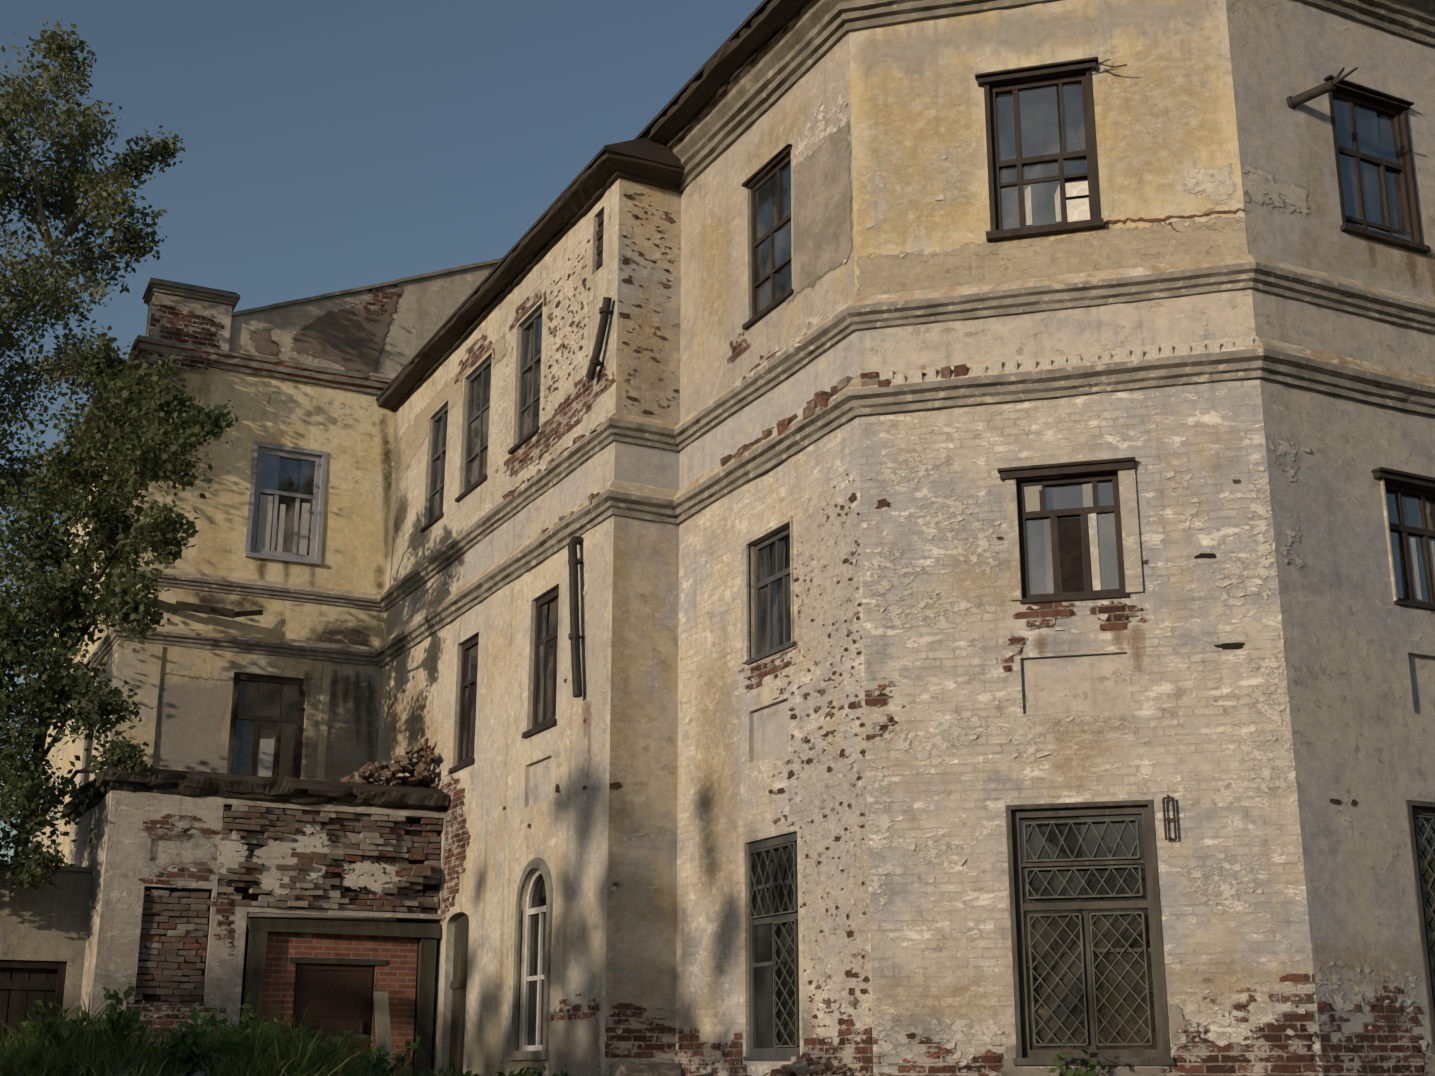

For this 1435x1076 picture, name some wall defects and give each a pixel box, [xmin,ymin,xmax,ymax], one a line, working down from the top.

spalling [334,284,401,319]
spalling [392,192,680,487]
spalling [991,600,1147,672]
peeling [738,448,1005,1076]
spalling [138,813,237,956]
spalling [440,773,470,921]
flaking render [549,993,752,1076]
flaking render [1163,959,1431,1076]